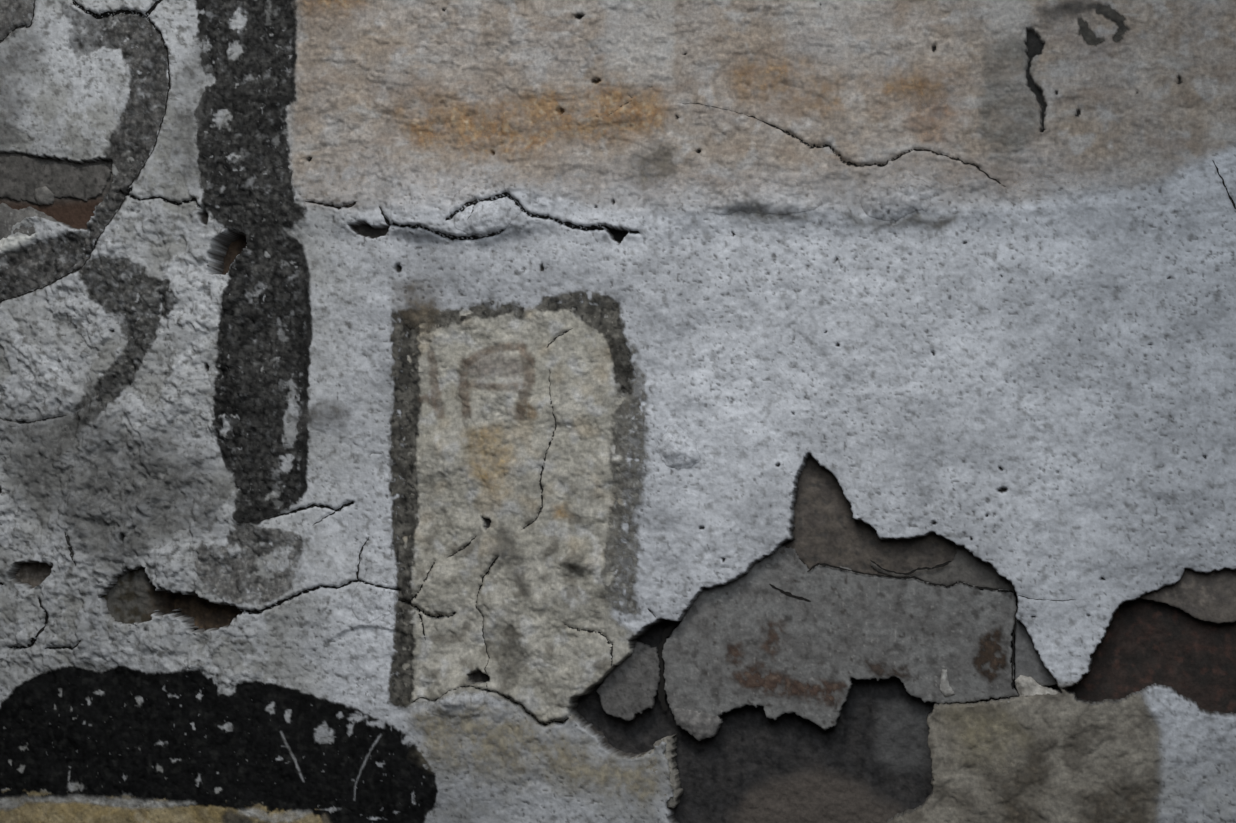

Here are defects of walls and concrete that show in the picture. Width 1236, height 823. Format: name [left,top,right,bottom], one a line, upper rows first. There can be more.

crack [0,0,201,303]
crack [679,102,1006,187]
spalling [0,153,113,240]
crack [306,192,639,240]
crack [522,328,573,529]
crack [241,501,354,526]
spalling [101,567,242,630]
crack [240,536,571,726]
crack [564,624,613,666]
spalling [576,455,1236,823]